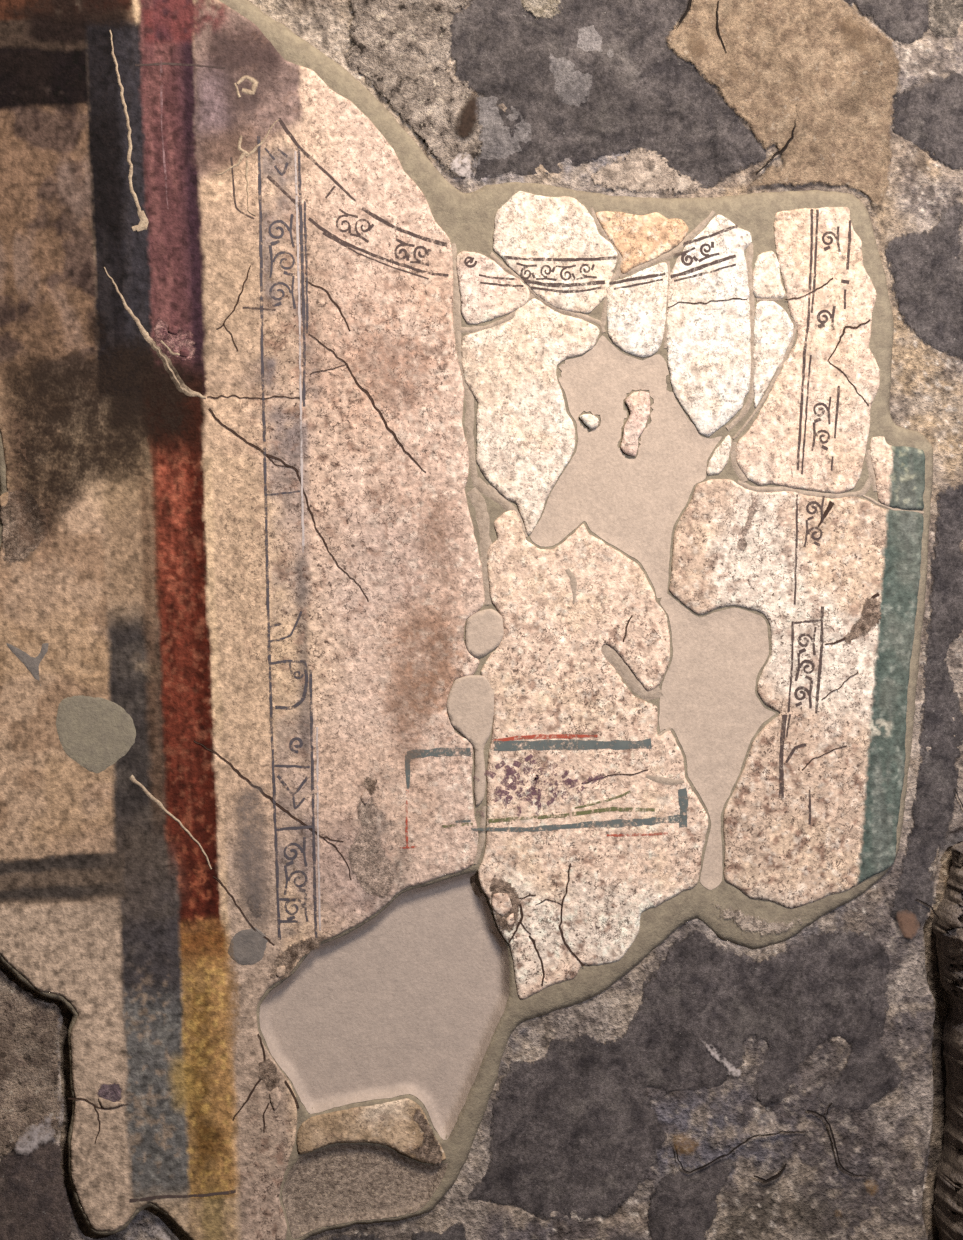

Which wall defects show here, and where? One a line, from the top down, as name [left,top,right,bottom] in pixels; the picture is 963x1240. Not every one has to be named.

crack [675,0,727,53]
crack [756,104,798,175]
crack [143,280,426,602]
crack [451,207,924,605]
crack [194,740,352,880]
crack [509,863,585,986]
flaking render [258,777,520,1239]
crack [674,1102,868,1183]